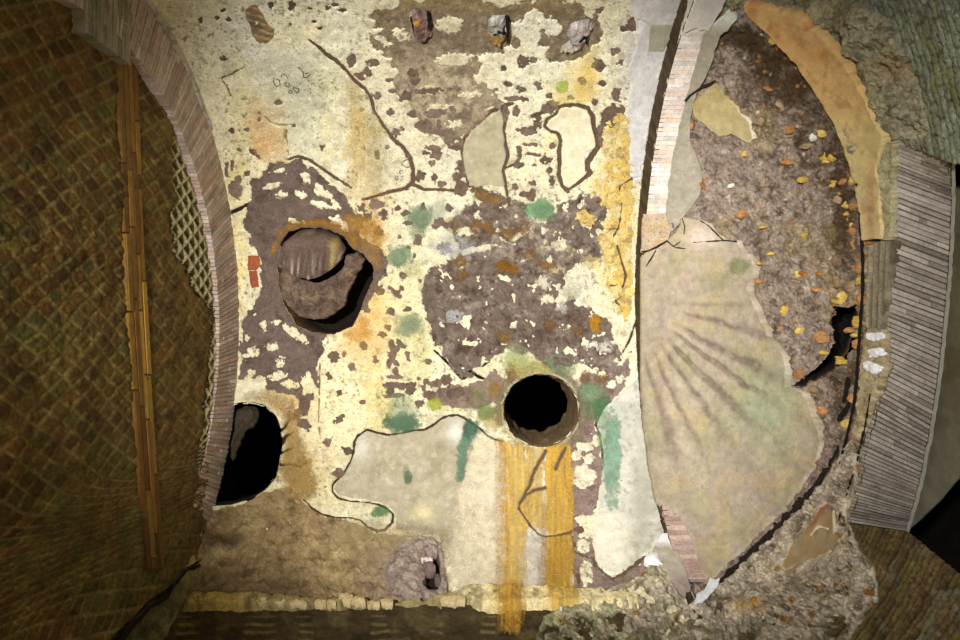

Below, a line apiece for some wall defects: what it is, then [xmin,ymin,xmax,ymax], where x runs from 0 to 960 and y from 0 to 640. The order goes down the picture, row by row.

crack [221,68,243,96]
crack [265,39,601,206]
corrosion [271,217,382,255]
spalling [224,0,648,590]
crack [609,178,737,353]
spalling [795,327,848,365]
spalling [794,176,873,350]
spalling [188,488,451,603]
water stain [328,505,416,561]
crack [303,414,504,533]
water stain [440,348,623,586]
corrosion [494,439,576,634]